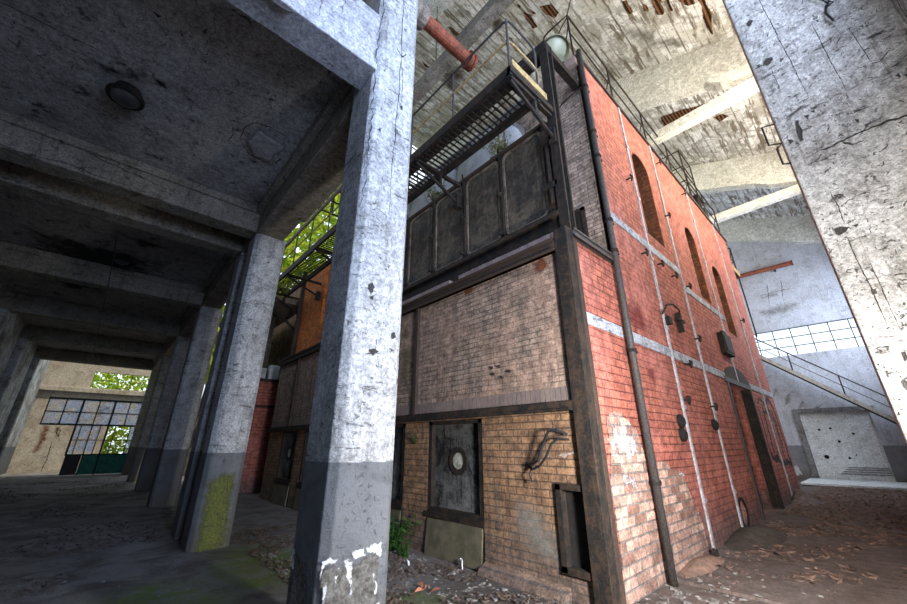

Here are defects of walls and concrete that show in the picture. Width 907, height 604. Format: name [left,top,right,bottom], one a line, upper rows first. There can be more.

spalling [517,4,559,29]
spalling [643,0,713,34]
crack [812,25,888,91]
spalling [661,104,704,126]
crack [809,114,907,157]
peeling [288,548,307,604]
peeling [320,542,382,604]